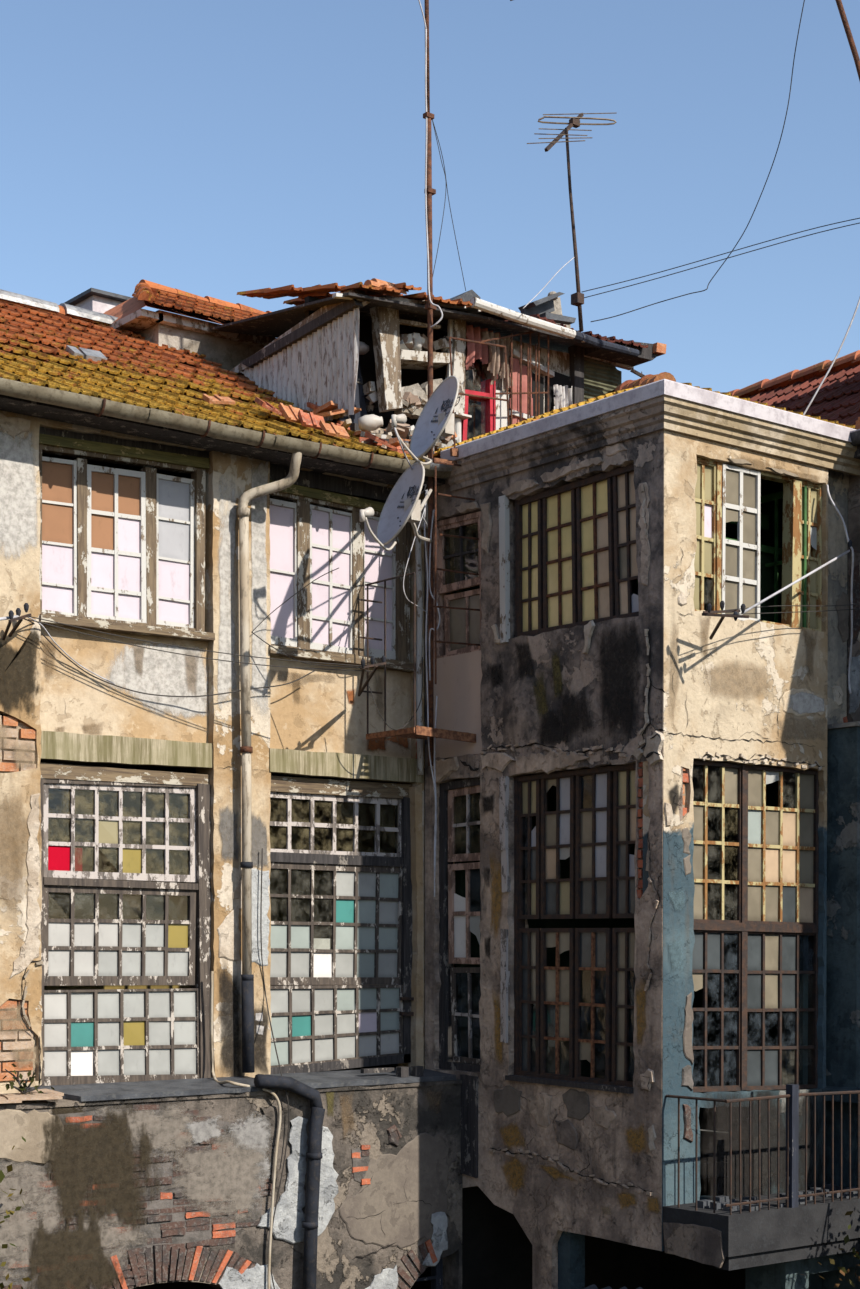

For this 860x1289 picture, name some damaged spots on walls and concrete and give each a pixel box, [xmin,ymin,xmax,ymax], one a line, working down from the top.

peeling [0,412,31,438]
flaking render [0,715,37,773]
water stain [516,643,534,677]
water stain [539,623,640,744]
peeling [10,793,41,978]
peeling [217,869,270,966]
crack [644,831,660,991]
water stain [52,1099,83,1114]
water stain [0,1161,147,1289]
water stain [101,1106,271,1228]
flaking render [0,999,449,1289]